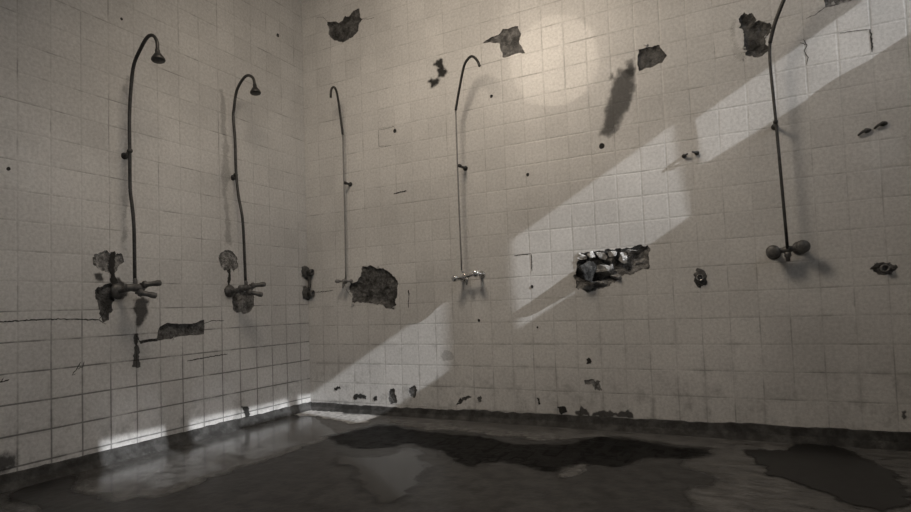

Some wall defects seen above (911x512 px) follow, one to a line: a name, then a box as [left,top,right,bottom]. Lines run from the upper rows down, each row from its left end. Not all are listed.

spalling [327,9,362,42]
peeling [483,26,525,58]
peeling [637,44,667,71]
spalling [739,13,772,58]
water stain [601,63,634,135]
spalling [219,250,238,271]
spalling [573,244,650,293]
spalling [93,250,124,322]
peeling [232,291,254,314]
spalling [349,265,398,310]
spalling [140,320,205,344]